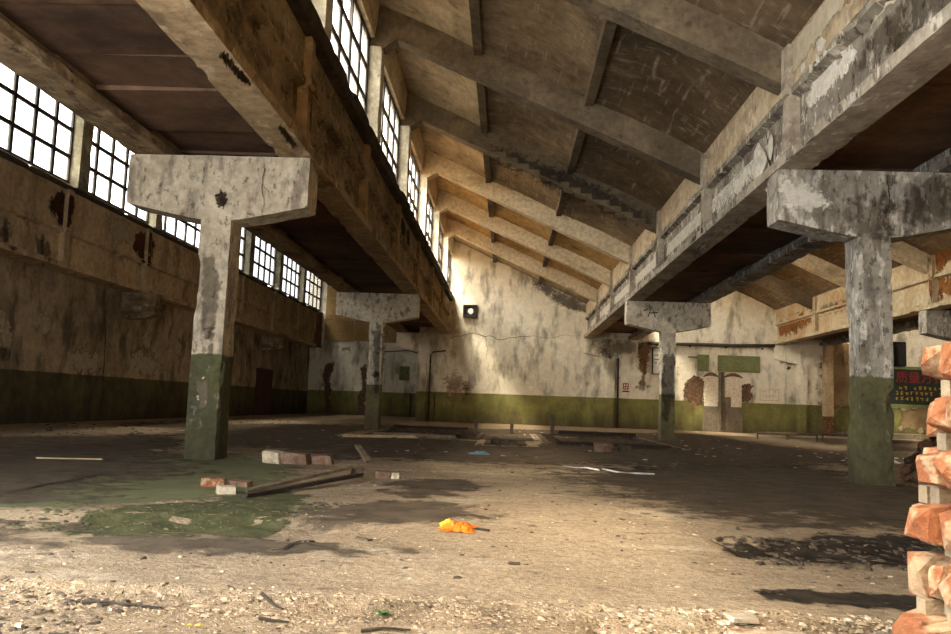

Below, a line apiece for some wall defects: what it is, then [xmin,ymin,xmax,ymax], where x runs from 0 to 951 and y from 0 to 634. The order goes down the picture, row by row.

spalling [683,375,704,408]